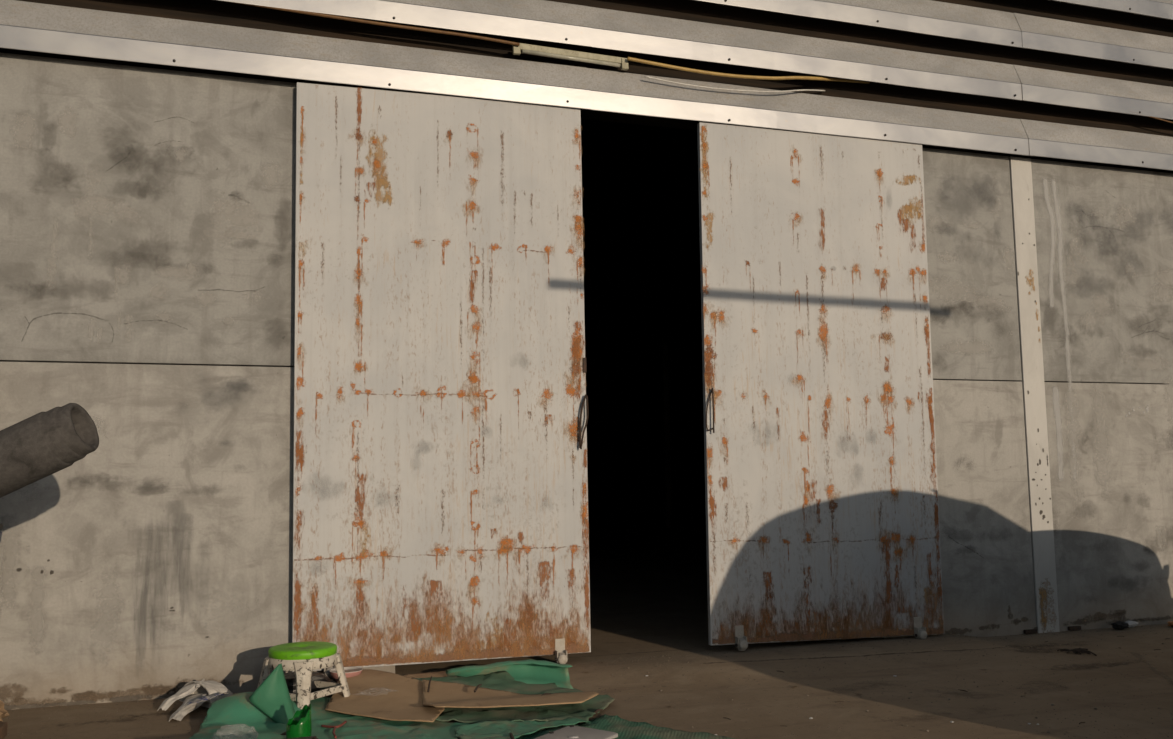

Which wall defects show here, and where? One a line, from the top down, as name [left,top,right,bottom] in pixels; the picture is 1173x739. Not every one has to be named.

corrosion [293,88,589,667]
corrosion [700,126,710,197]
corrosion [702,213,713,248]
corrosion [702,267,725,424]
corrosion [707,266,944,644]
corrosion [898,150,925,251]
water stain [1044,179,1070,369]